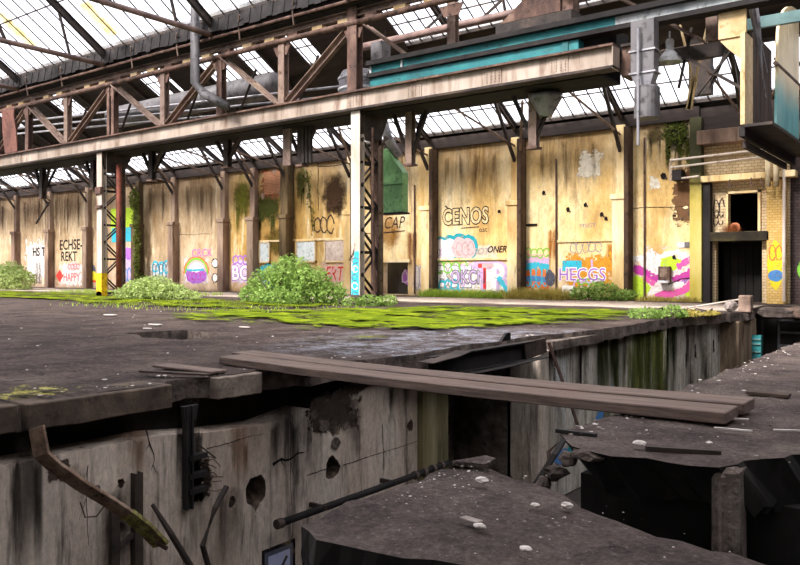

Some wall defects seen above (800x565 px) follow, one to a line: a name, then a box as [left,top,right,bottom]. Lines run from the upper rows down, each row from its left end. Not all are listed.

water stain [322,173,347,214]
peeling [576,149,604,179]
peeling [649,163,690,227]
crack [146,430,158,474]
spalling [49,383,417,565]
crack [272,405,417,506]
spalling [0,452,109,565]